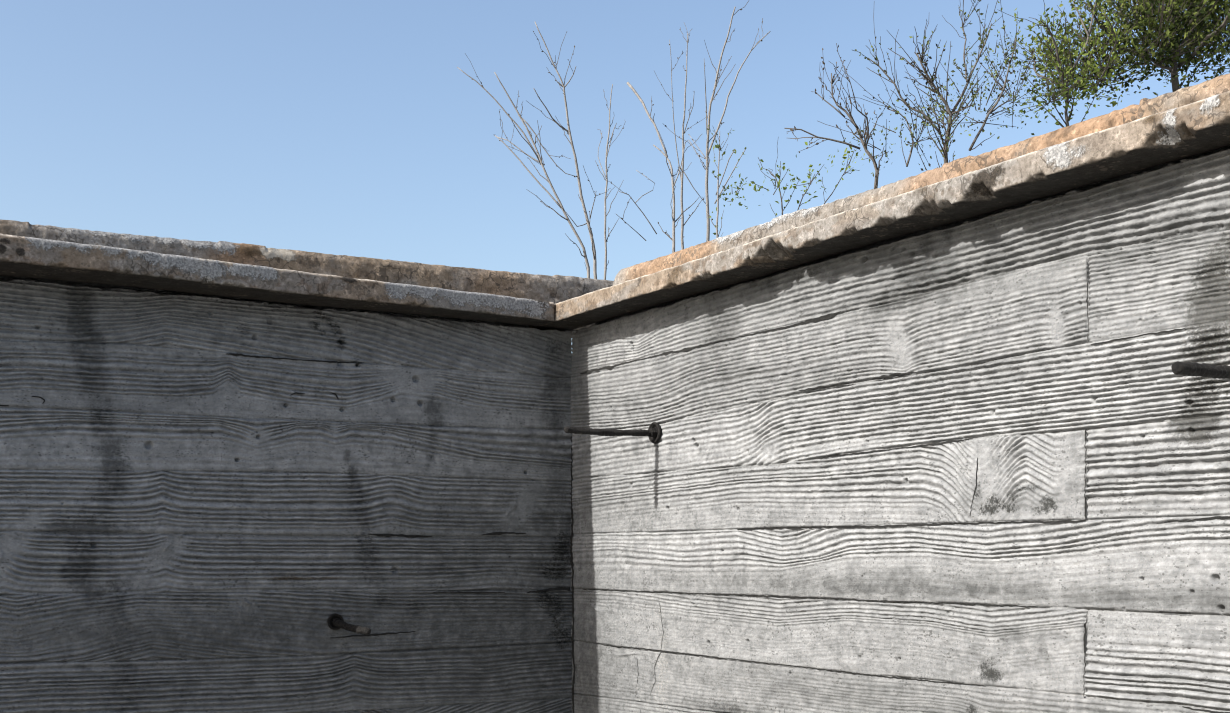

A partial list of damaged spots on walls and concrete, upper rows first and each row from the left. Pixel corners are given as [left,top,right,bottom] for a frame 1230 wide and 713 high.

water stain [54,286,124,596]
water stain [1174,238,1230,444]